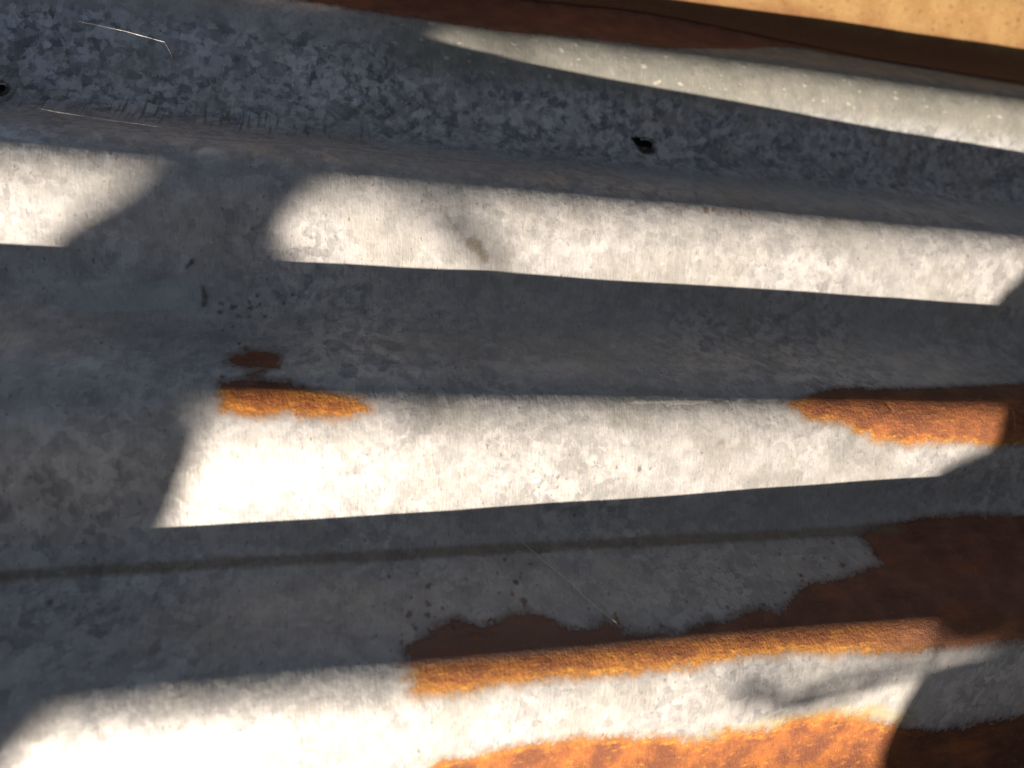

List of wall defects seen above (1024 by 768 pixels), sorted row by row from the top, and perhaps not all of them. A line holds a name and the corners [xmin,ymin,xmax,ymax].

corrosion [218,348,369,418]
corrosion [788,382,1024,446]
corrosion [404,513,1024,698]
corrosion [430,713,1024,768]